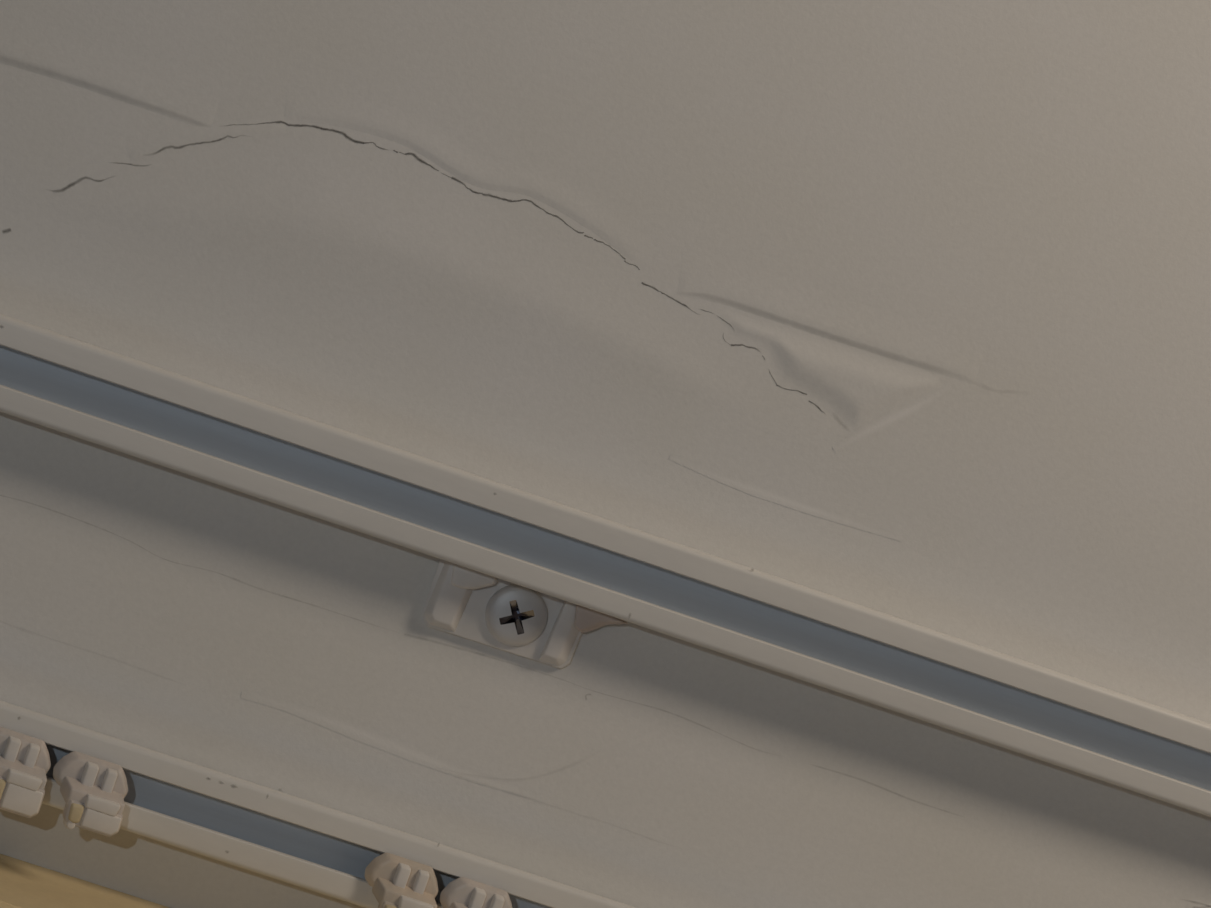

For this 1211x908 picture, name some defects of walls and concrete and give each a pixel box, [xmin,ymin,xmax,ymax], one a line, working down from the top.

crack [123,113,287,166]